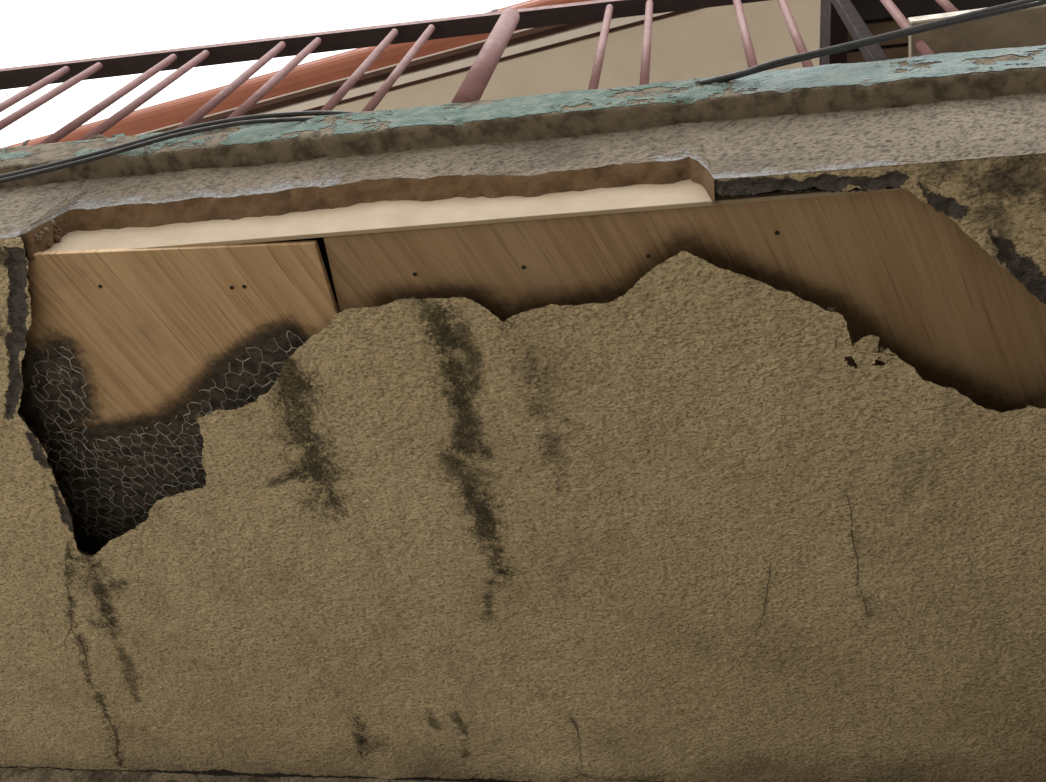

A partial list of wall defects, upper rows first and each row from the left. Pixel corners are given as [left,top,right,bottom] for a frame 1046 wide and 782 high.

peeling [64,45,1046,158]
peeling [987,227,1046,305]
leakage [269,357,349,521]
flaking render [0,148,969,557]
leakage [377,238,1035,615]
crack [0,544,528,782]
crack [758,562,771,631]
crack [564,716,655,782]